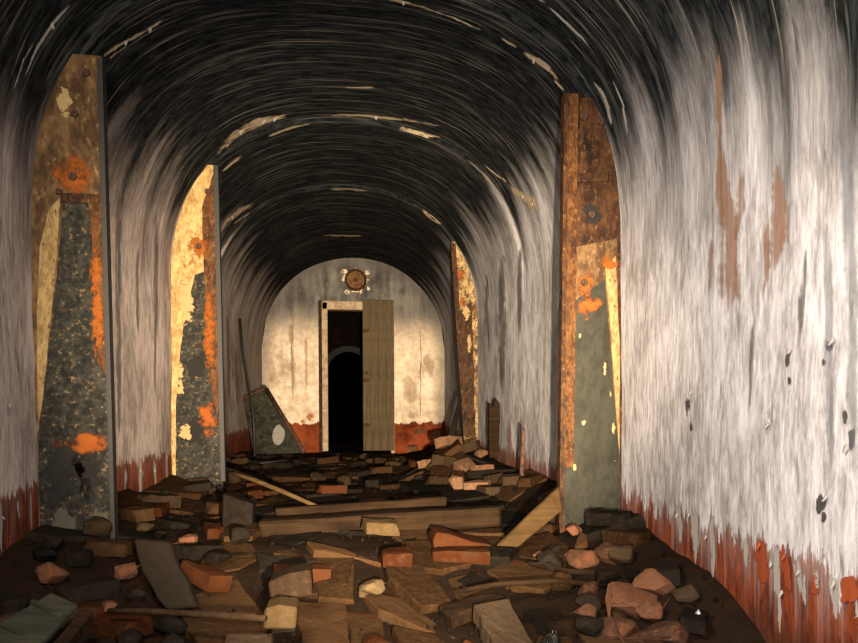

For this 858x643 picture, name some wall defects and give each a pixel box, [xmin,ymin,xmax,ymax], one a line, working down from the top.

spalling [391,0,478,29]
peeling [539,0,588,45]
spalling [525,53,563,90]
spalling [220,115,308,151]
spalling [333,114,439,138]
rust [53,156,91,193]
spalling [487,167,540,213]
spalling [221,205,250,232]
rust [601,255,618,269]
rust [90,249,103,356]
rust [578,277,602,320]
rust [72,433,107,454]